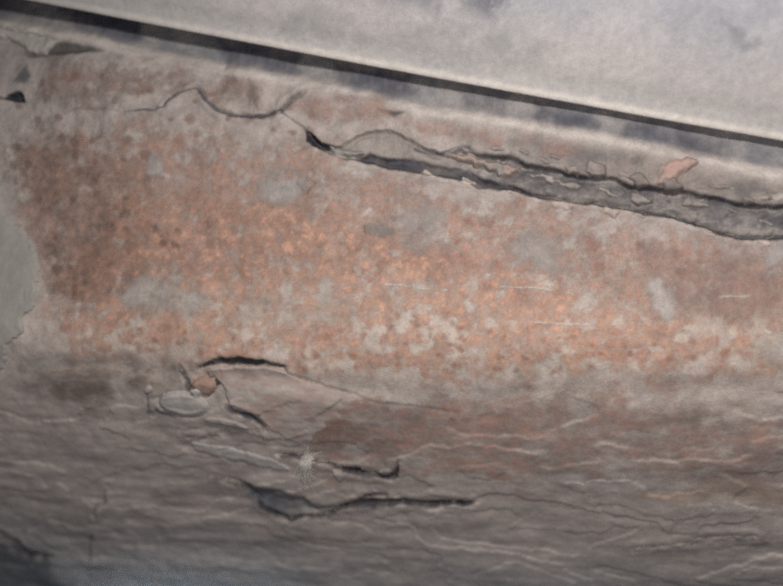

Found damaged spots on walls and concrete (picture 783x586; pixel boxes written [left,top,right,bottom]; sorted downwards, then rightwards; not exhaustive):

crack [0,91,26,102]
crack [135,88,288,118]
spalling [306,129,783,274]
flaking render [0,205,41,371]
rust [40,198,718,399]
flaking render [647,278,673,320]
spalling [159,357,372,445]